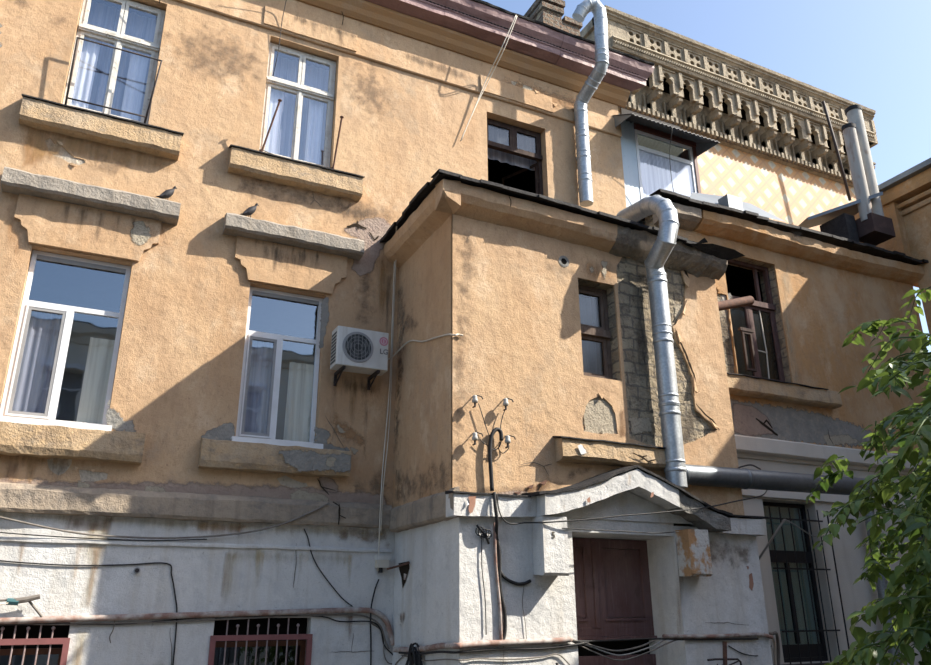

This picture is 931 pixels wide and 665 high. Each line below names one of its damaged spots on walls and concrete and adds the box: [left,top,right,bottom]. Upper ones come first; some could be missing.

flaking render [345,217,391,276]
flaking render [674,299,698,393]
flaking render [584,393,617,434]
flaking render [0,457,386,505]